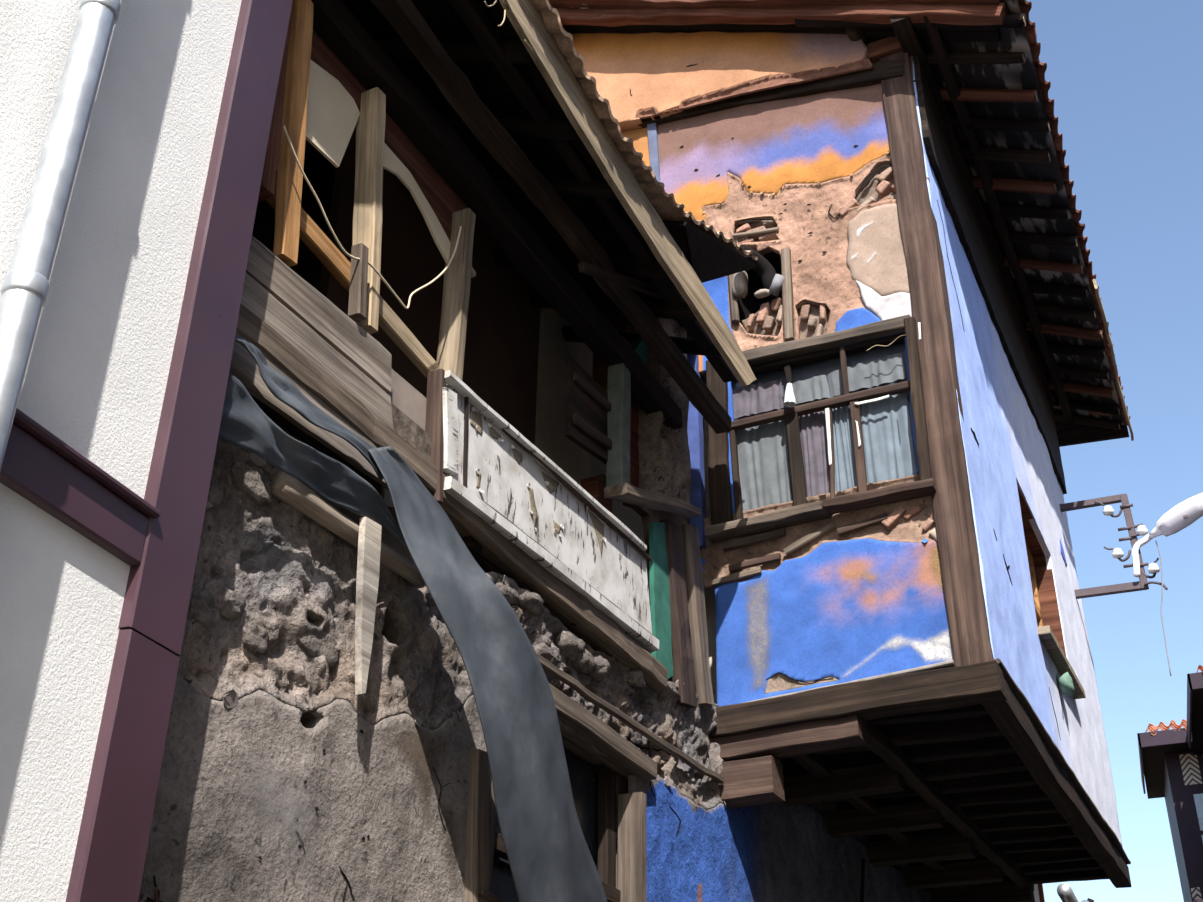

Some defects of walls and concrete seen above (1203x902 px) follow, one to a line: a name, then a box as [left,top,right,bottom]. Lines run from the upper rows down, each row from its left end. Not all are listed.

flaking render [702,151,921,351]
peeling [470,407,522,464]
peeling [527,472,563,532]
peeling [587,506,607,557]
flaking render [182,437,474,733]
flaking render [495,575,727,810]
flaking render [764,674,839,694]